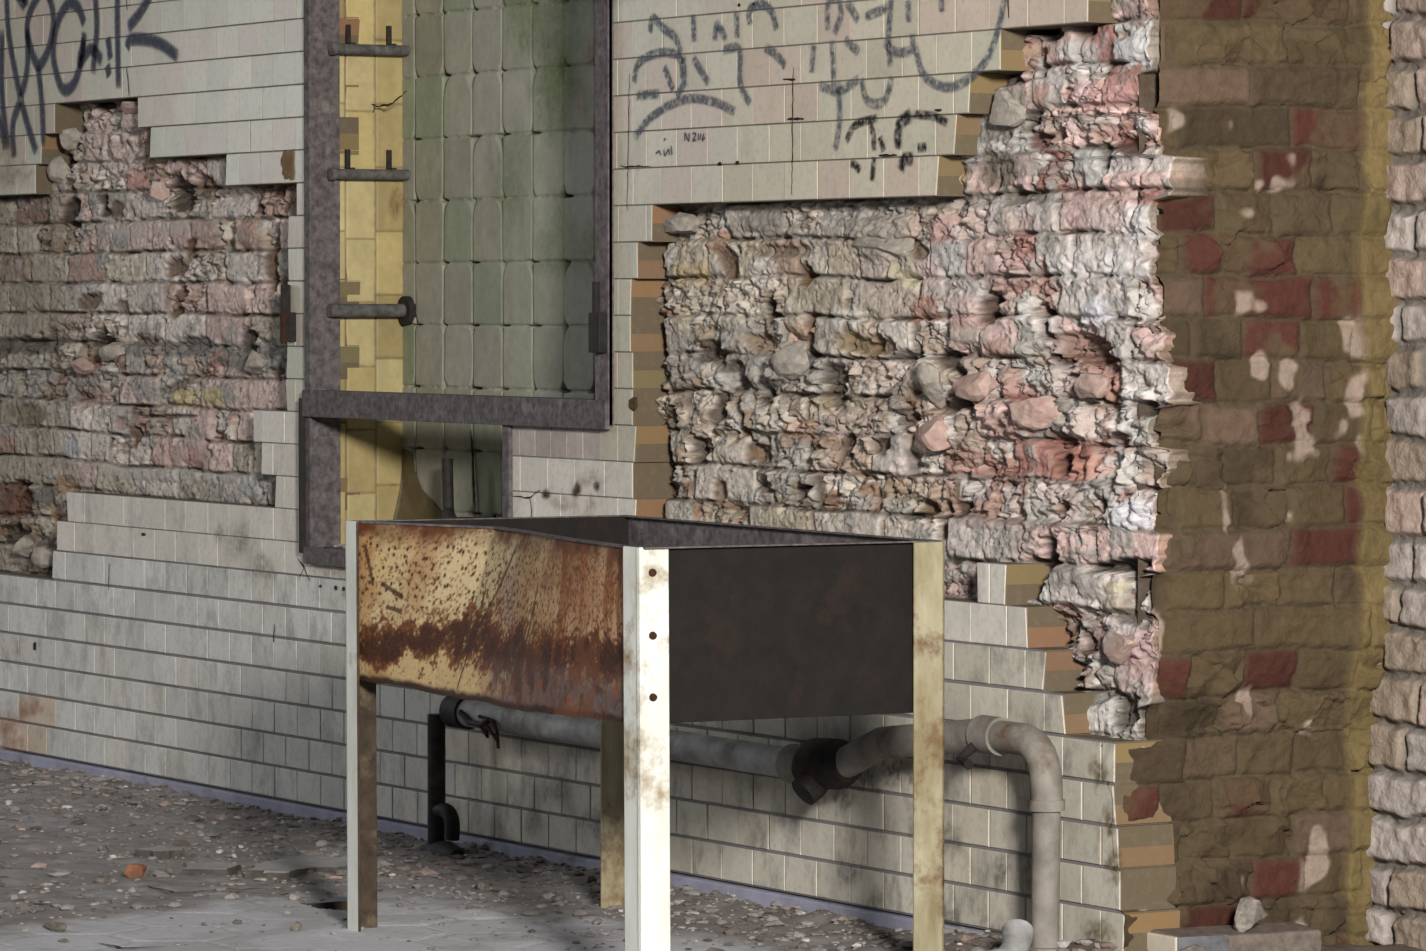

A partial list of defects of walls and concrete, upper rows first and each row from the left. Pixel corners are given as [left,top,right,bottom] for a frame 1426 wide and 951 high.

spalling [0,99,298,577]
spalling [628,397,638,411]
spalling [656,0,1211,748]